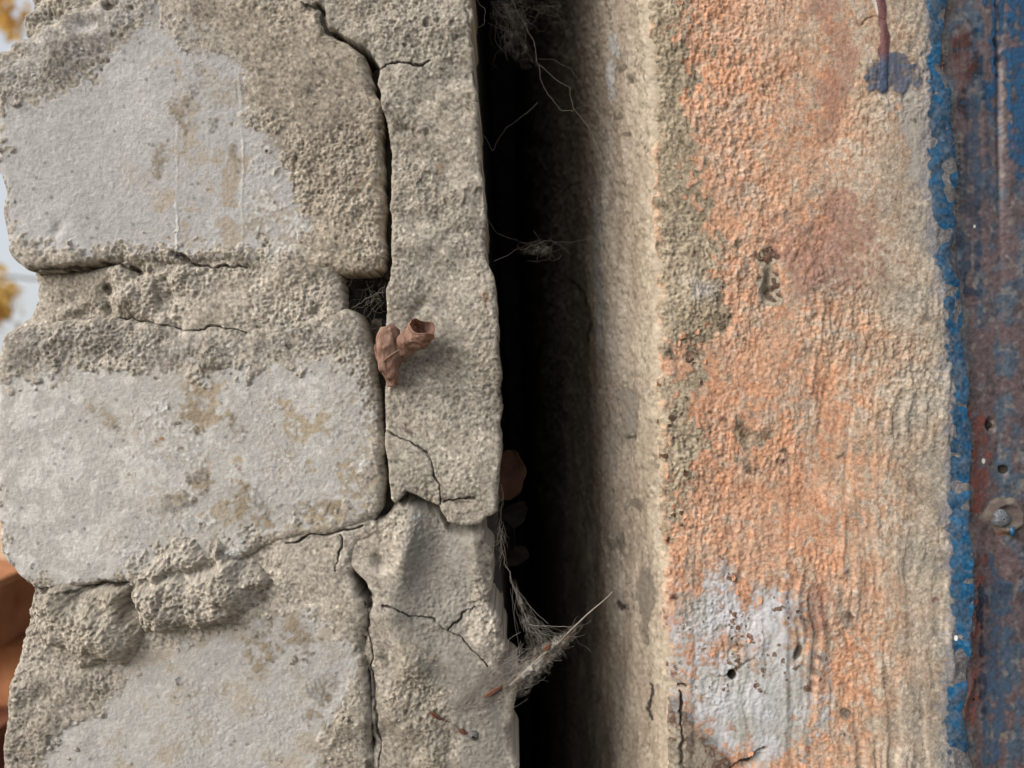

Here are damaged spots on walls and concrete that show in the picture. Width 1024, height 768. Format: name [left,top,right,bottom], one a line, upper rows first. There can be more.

crack [300,1,337,39]
peeling [958,0,1024,227]
crack [372,61,429,280]
peeling [647,0,742,542]
peeling [755,245,783,306]
crack [293,319,475,559]
peeling [731,415,786,474]
rust [968,410,992,513]
crack [370,663,382,739]
crack [368,599,465,633]
peeling [662,557,852,766]